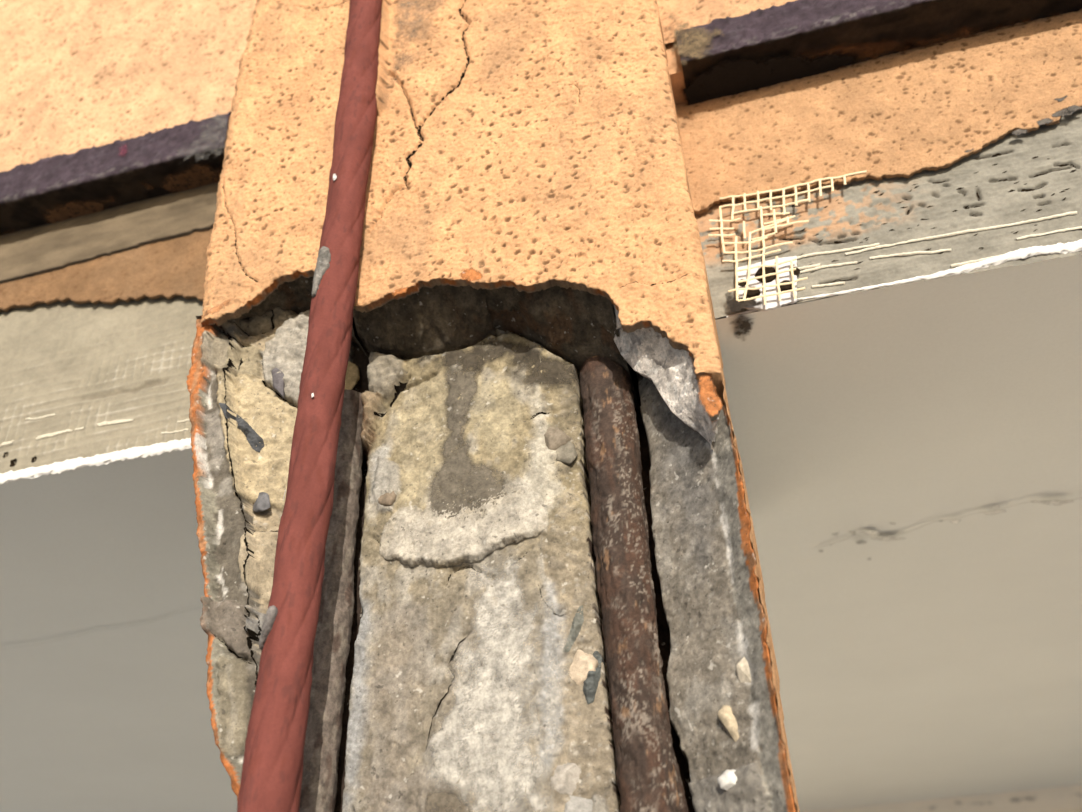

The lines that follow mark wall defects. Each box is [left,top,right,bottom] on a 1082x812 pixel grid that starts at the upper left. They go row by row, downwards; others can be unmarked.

crack [372,0,470,231]
flaking render [694,109,1082,318]
spalling [0,276,314,803]
spalling [334,268,796,812]
crack [425,638,466,750]